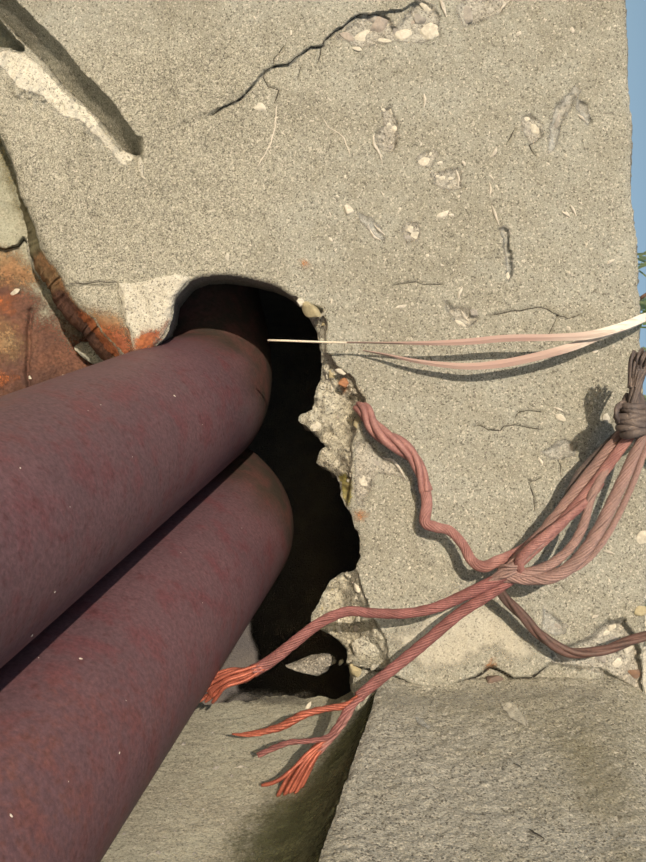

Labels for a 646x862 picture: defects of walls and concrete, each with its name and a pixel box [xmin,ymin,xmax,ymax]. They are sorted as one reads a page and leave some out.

crack [213,14,379,165]
rust [0,247,165,397]
flaking render [118,274,189,350]
crack [489,307,578,333]
spalling [295,298,406,507]
crack [473,410,543,431]
spalling [313,570,391,679]
crack [344,661,409,683]
crack [460,666,546,682]
damp [230,693,376,862]